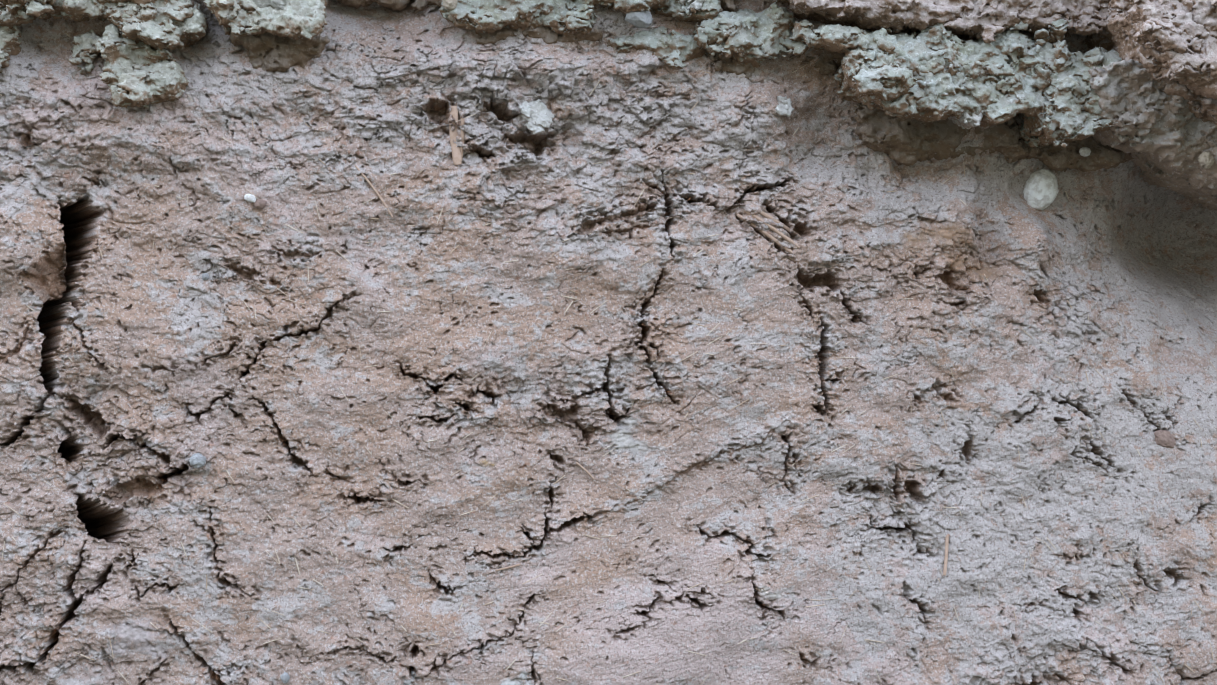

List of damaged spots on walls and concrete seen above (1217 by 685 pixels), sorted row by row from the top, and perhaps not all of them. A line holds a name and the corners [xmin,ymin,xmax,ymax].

crack [553,170,795,423]
crack [4,265,111,443]
crack [399,364,497,423]
crack [472,286,866,567]
crack [0,528,181,674]
crack [170,622,241,685]
crack [208,506,254,597]
crack [428,570,452,592]
crack [427,595,537,684]
crack [616,579,707,634]
crack [699,529,784,618]